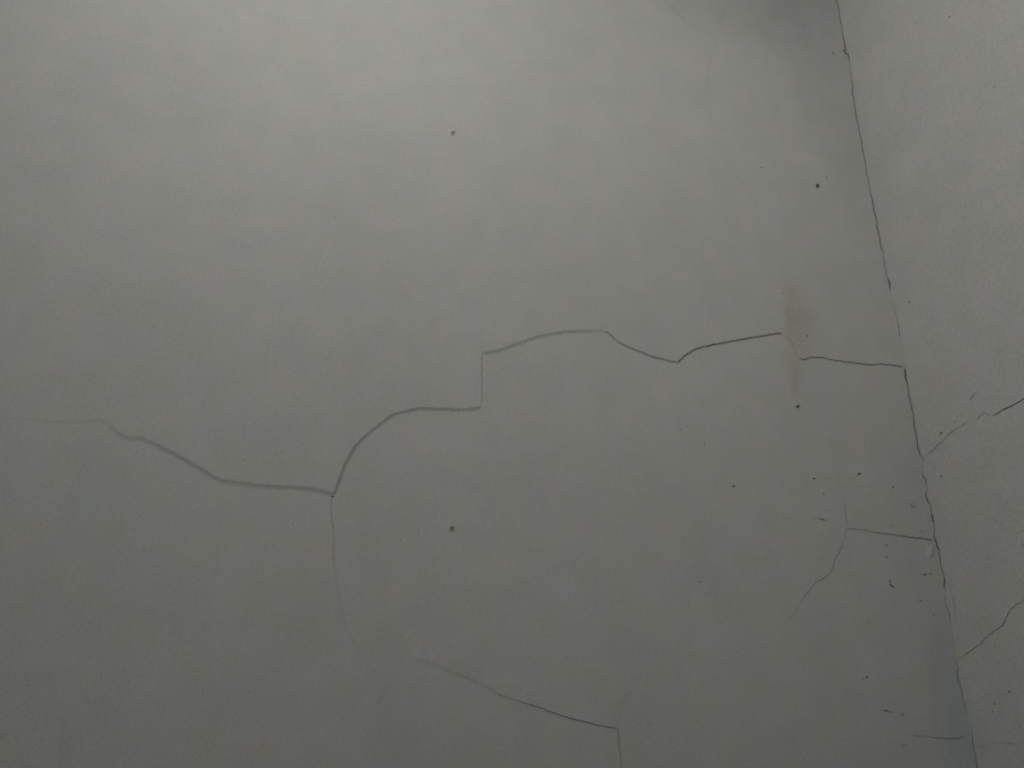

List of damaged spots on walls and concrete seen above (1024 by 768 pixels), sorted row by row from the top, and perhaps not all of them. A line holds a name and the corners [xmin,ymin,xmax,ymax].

crack [799,356,907,381]
crack [992,398,1024,417]
crack [10,328,782,676]
crack [788,516,934,621]
crack [957,599,1024,659]
crack [417,658,624,768]